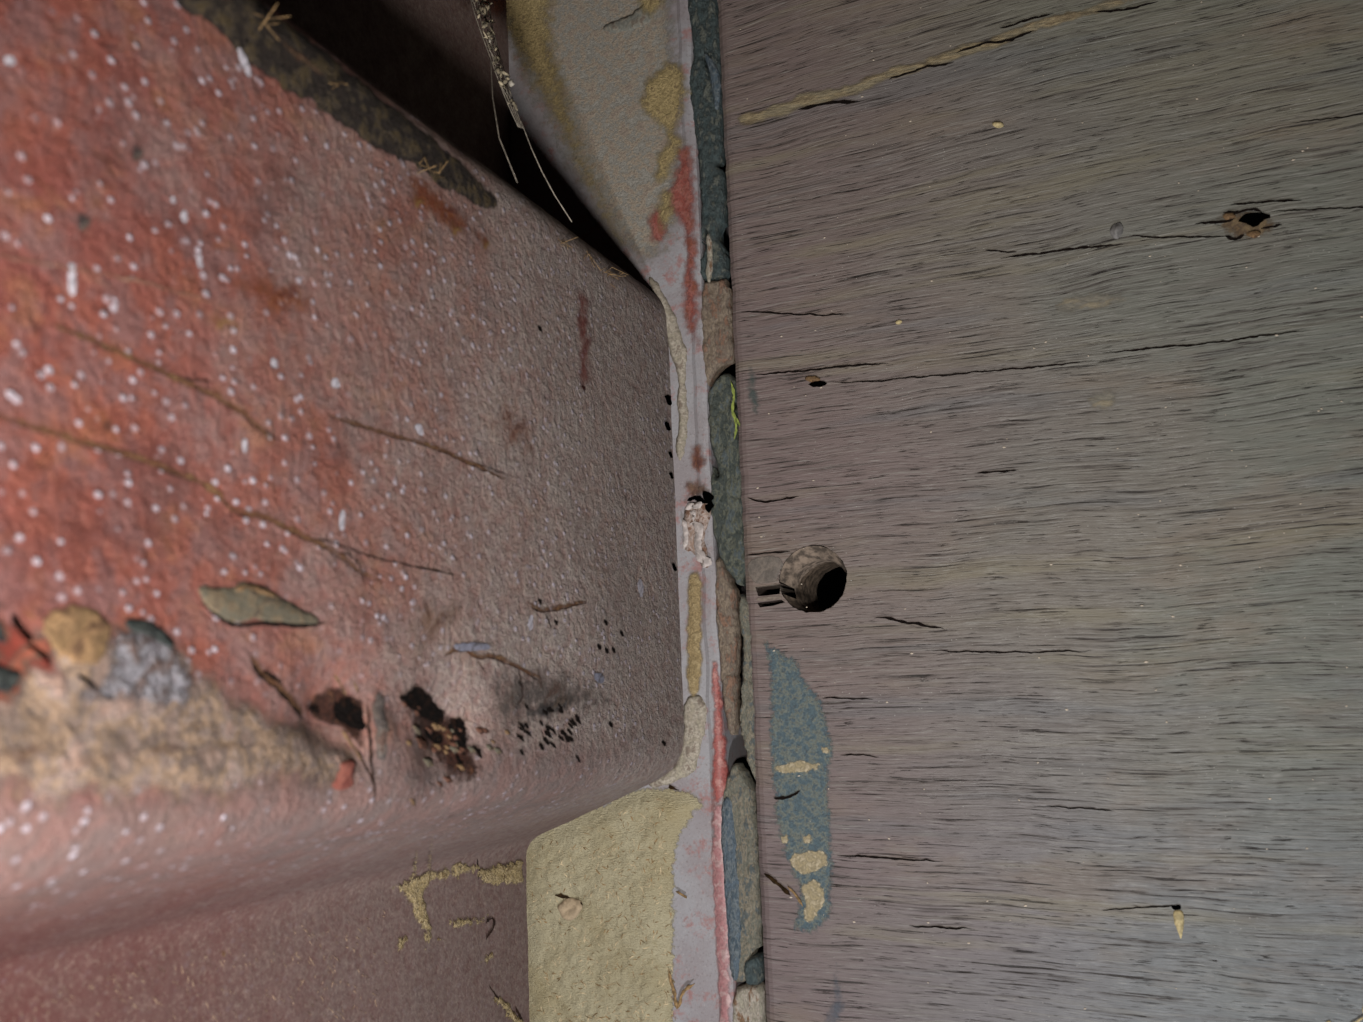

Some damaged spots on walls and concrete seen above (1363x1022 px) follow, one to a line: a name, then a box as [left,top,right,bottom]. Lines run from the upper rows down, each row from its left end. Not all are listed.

peeling [603,5,655,33]
crack [49,323,280,445]
crack [330,415,508,481]
crack [0,415,461,585]
spalling [0,604,114,704]
peeling [198,581,327,628]
crack [527,601,588,629]
spalling [305,675,367,762]
spalling [399,688,582,787]